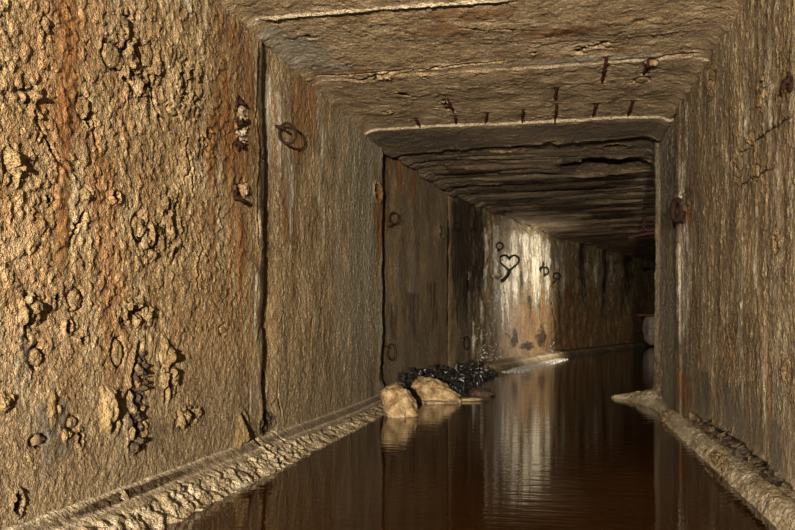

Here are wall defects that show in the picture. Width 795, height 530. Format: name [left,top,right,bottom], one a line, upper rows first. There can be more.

rust [58,0,77,183]
rust [207,6,253,289]
spalling [233,105,247,149]
crack [735,115,793,201]
spalling [19,288,43,333]
spalling [55,287,82,311]
spalling [110,338,123,367]
damp [440,169,637,354]
spalling [128,351,149,455]